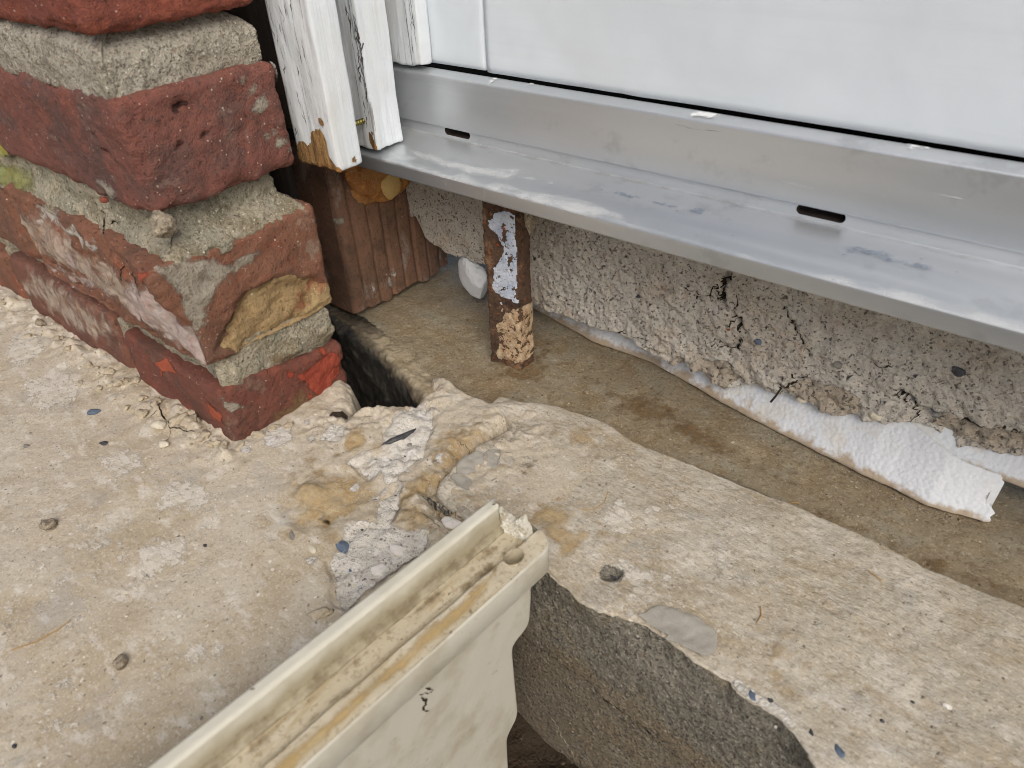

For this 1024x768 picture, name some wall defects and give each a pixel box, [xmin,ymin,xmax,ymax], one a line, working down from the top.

spalling [321,403,443,615]
spalling [599,564,625,583]
spalling [733,679,797,730]